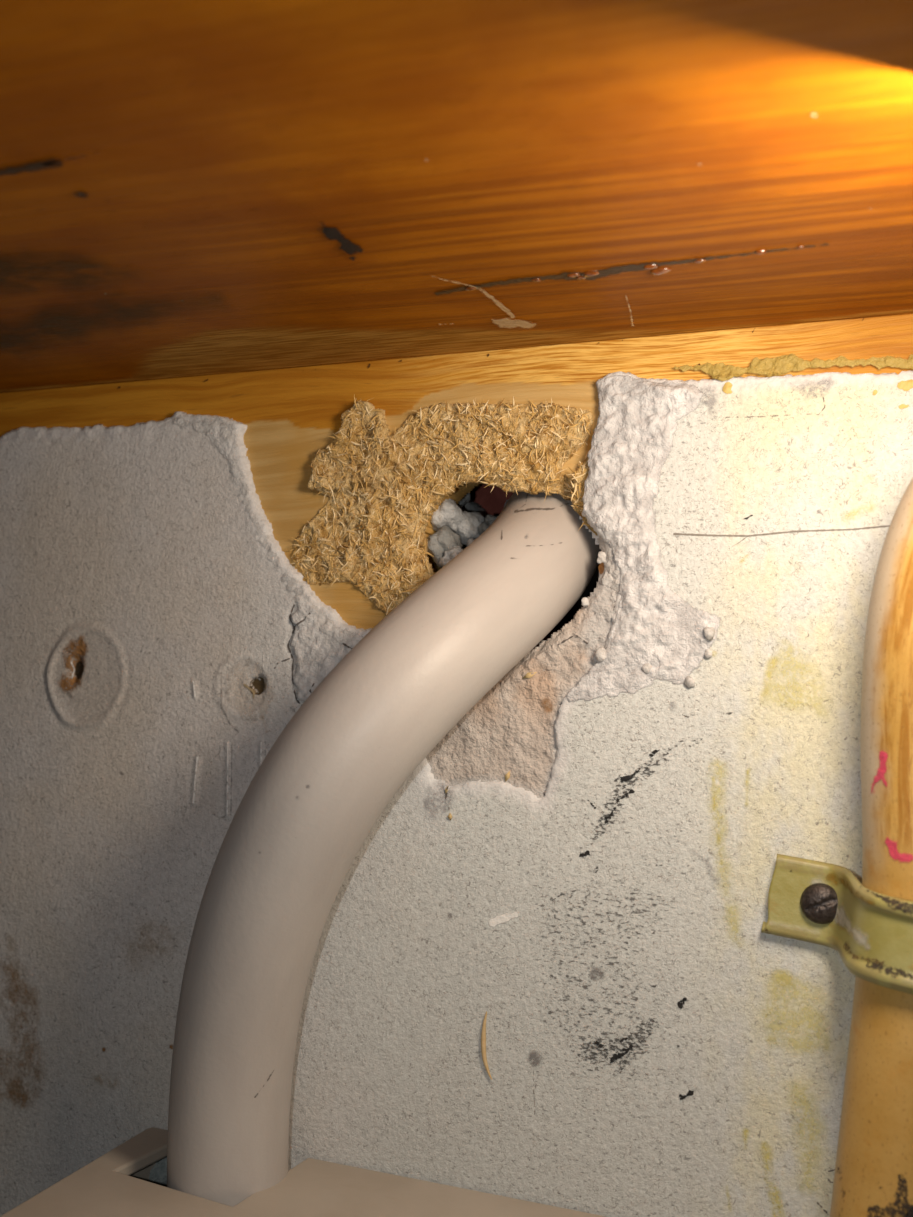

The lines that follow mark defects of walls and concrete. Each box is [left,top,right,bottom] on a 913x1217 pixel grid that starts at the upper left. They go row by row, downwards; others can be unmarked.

spalling [173,416,363,702]
spalling [426,375,721,798]